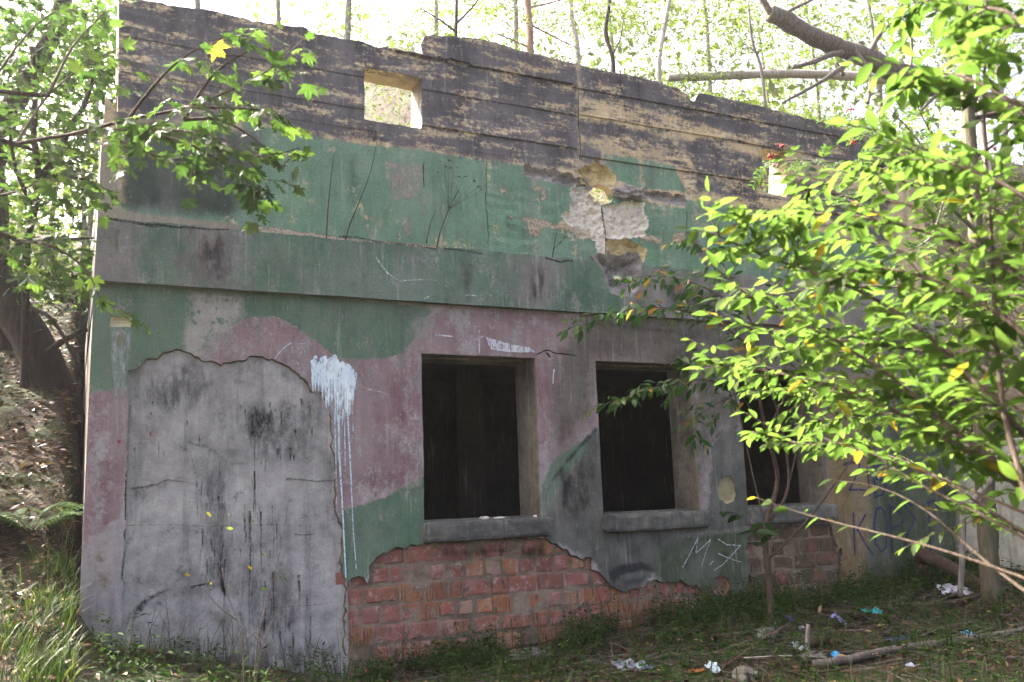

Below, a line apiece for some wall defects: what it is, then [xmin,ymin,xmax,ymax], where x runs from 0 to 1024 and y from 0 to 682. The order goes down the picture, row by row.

spalling [509,160,714,298]
leakage [245,403,282,438]
leakage [240,450,294,646]
spalling [120,349,729,681]
spalling [742,523,843,602]